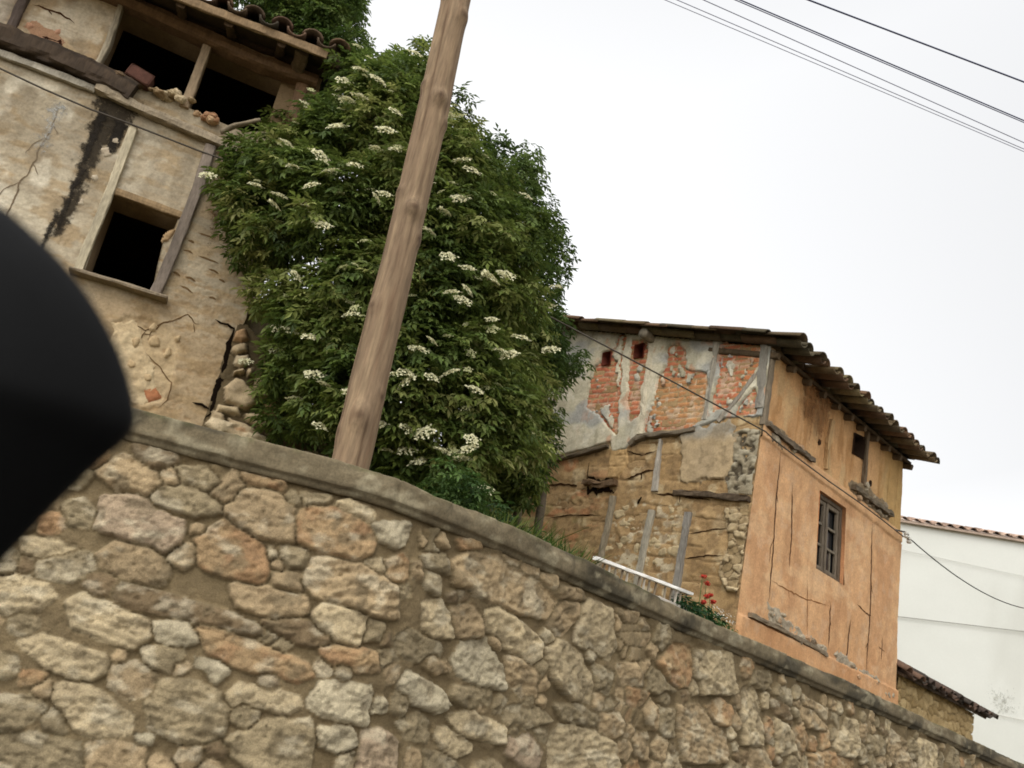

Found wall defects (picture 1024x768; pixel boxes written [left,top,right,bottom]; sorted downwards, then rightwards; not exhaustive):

crack [0,108,58,212]
leakage [42,96,144,243]
crack [136,314,235,421]
flaking render [586,335,808,592]
crack [769,455,885,674]
flaking render [767,602,895,698]